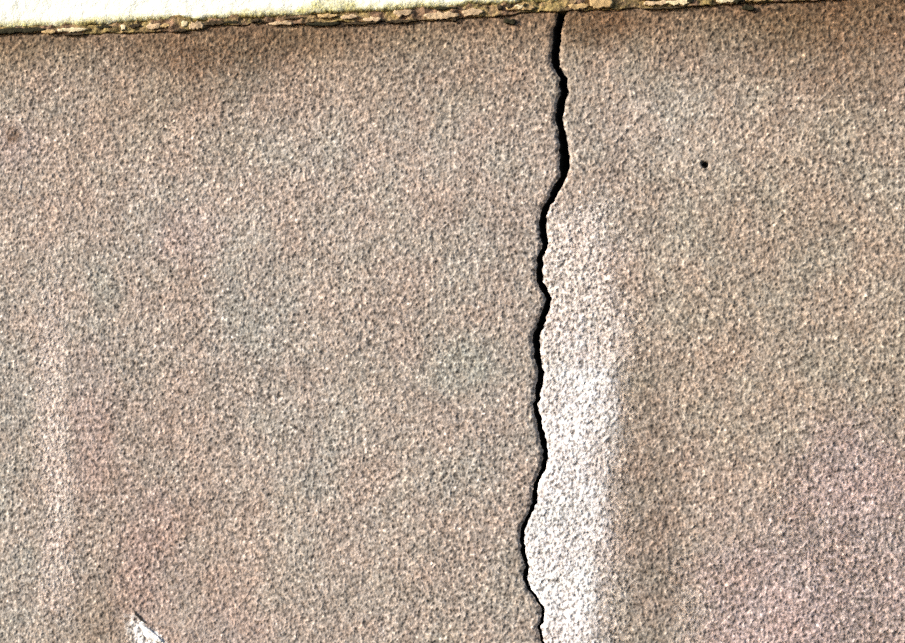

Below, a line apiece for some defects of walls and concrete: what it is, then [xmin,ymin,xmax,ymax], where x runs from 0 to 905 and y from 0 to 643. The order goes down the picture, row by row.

crack [519,11,570,643]